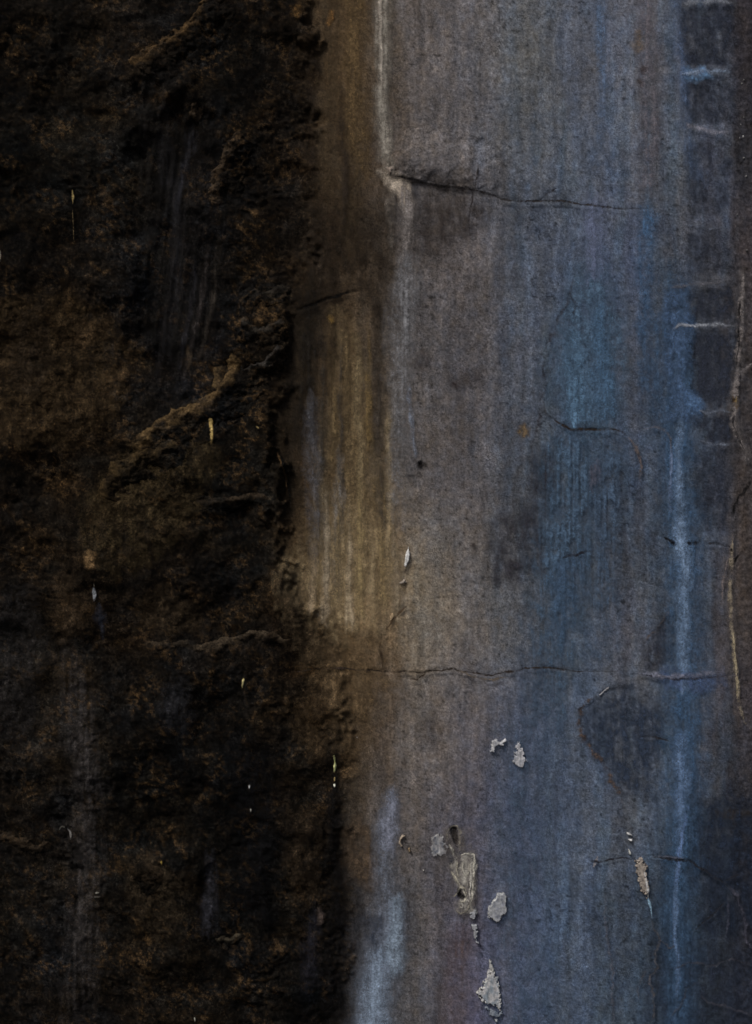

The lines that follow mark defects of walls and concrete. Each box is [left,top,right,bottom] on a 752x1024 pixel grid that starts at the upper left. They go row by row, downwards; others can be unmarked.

crack [397,168,621,230]
crack [536,292,672,472]
water stain [0,0,384,1024]
water stain [493,206,624,806]
crack [297,607,590,681]
water stain [654,287,752,1024]
peeling [490,738,528,768]
water stain [359,790,401,1024]
peeling [428,825,507,944]
crack [592,856,628,864]
peeling [476,959,503,1022]